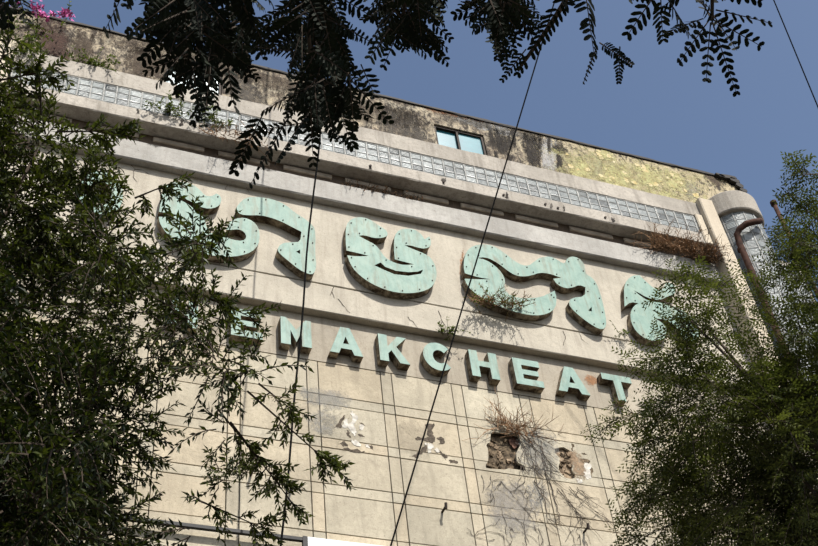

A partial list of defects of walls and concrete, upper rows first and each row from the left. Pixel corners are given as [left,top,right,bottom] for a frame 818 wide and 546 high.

damp [71,29,168,80]
damp [219,63,300,104]
damp [352,99,427,141]
damp [444,115,565,171]
spalling [334,411,373,453]
spalling [413,423,458,464]
spalling [486,434,524,471]
spalling [555,444,593,483]